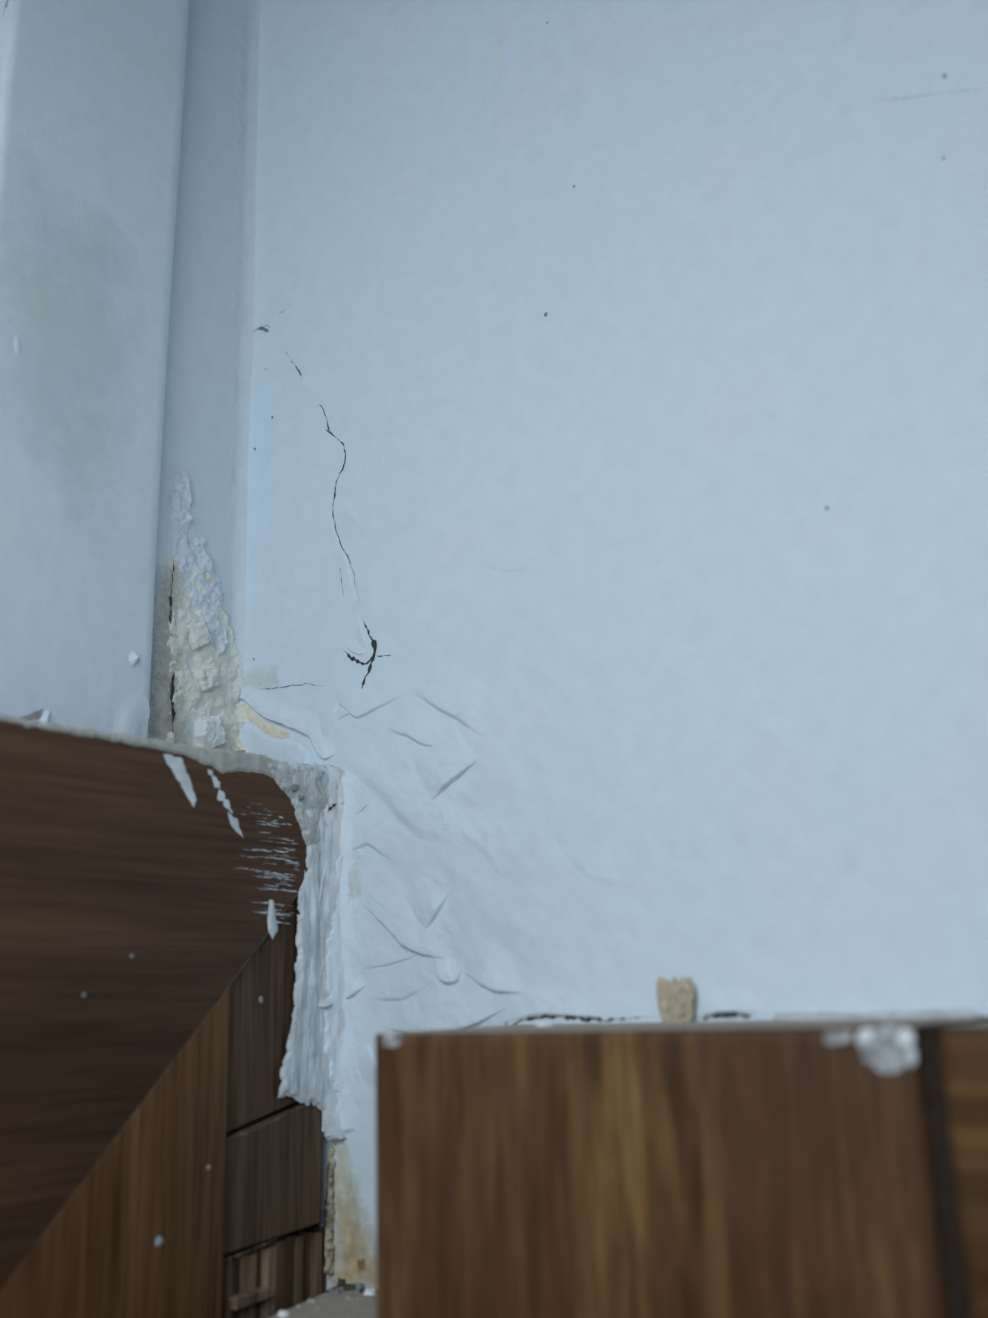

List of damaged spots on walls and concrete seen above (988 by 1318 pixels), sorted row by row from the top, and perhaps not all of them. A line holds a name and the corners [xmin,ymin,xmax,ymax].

peeling [19,709,51,723]
flaking render [159,467,337,765]
crack [253,311,390,688]
rust [331,1148,377,1291]